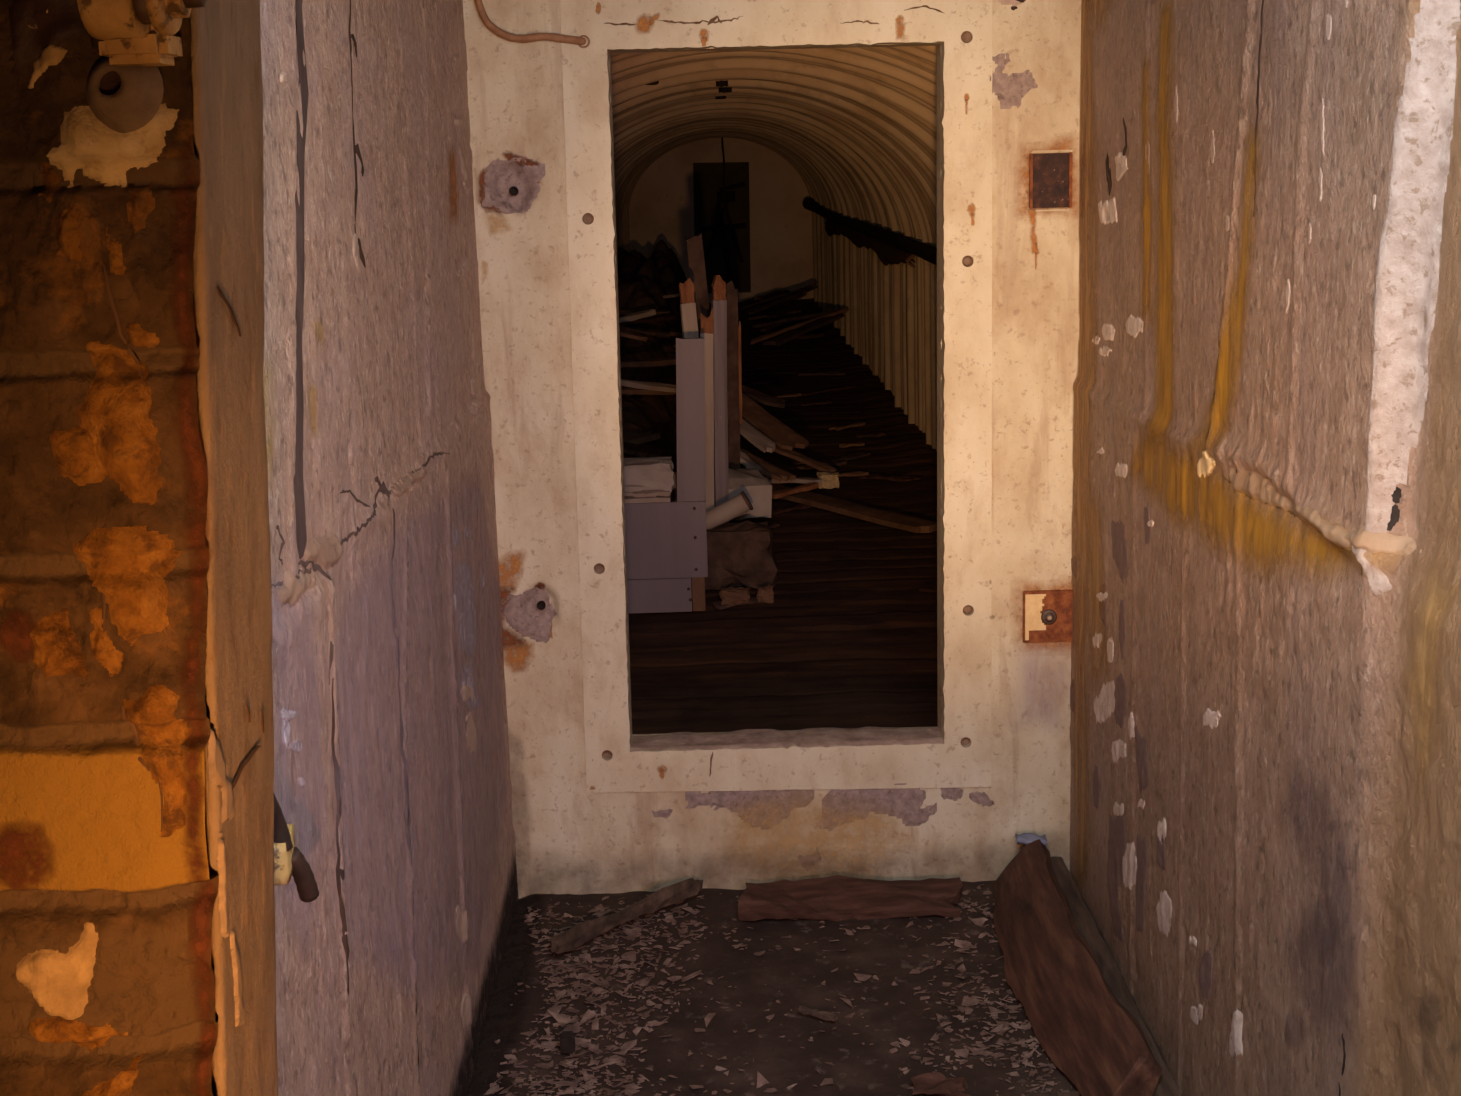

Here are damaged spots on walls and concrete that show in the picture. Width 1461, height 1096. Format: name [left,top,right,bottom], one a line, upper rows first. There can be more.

peeling [990,53,1038,109]
spalling [454,118,545,214]
crack [216,286,241,337]
water stain [1134,0,1460,596]
crack [271,0,450,866]
corrosion [1021,0,1106,875]
peeling [1197,450,1216,478]
spalling [502,586,557,643]
crack [232,705,264,789]
peeling [1092,506,1172,943]
peeling [652,783,995,831]
peeling [1229,1009,1243,1060]